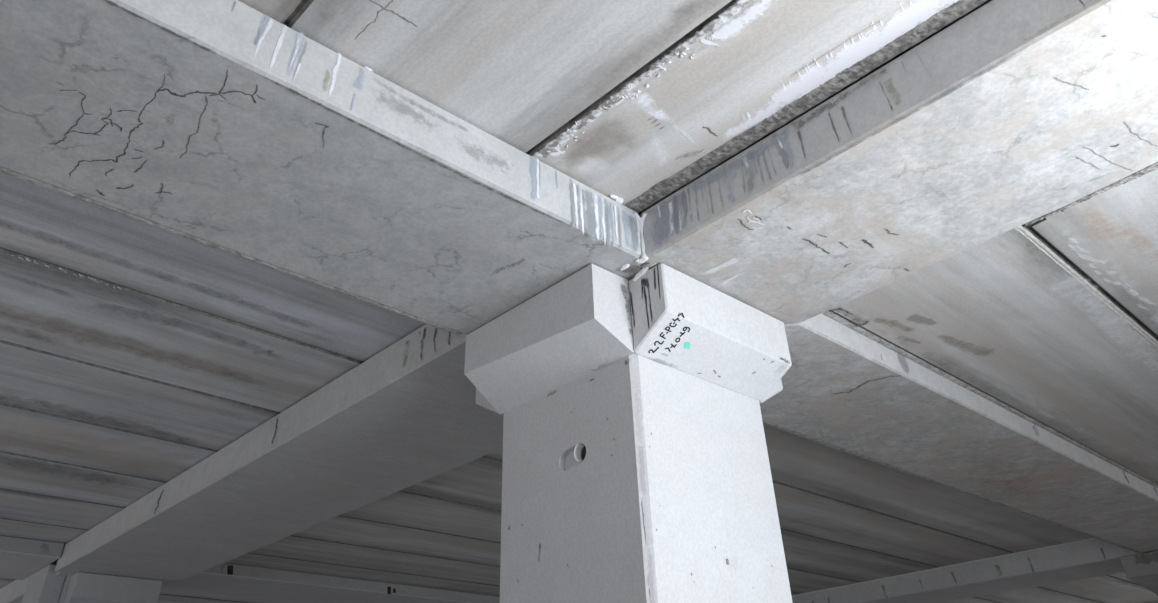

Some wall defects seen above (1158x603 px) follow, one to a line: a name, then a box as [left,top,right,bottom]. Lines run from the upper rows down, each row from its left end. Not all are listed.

crack [48,70,265,196]
leakage [255,17,307,77]
leakage [329,54,341,93]
crack [355,0,417,39]
leakage [531,0,770,199]
leakage [556,131,793,328]